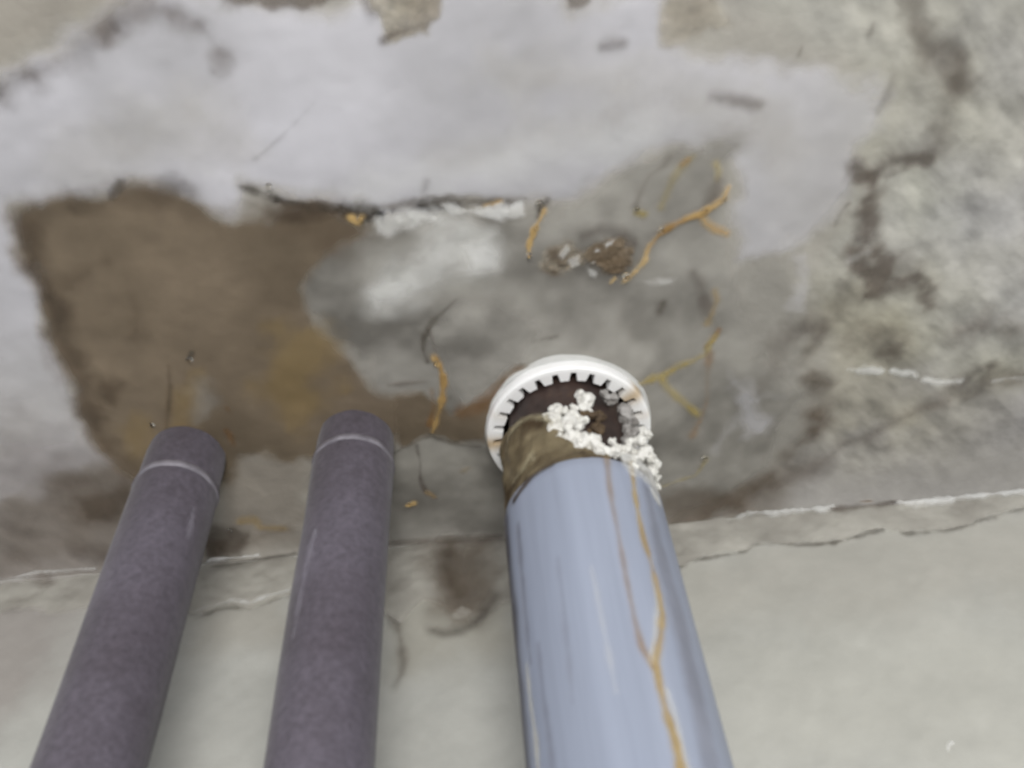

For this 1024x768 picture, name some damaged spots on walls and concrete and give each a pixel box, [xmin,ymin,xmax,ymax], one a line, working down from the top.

spalling [540,230,636,276]
leakage [10,180,529,521]
crack [393,308,481,507]
leakage [543,389,1024,524]
leakage [803,371,833,388]